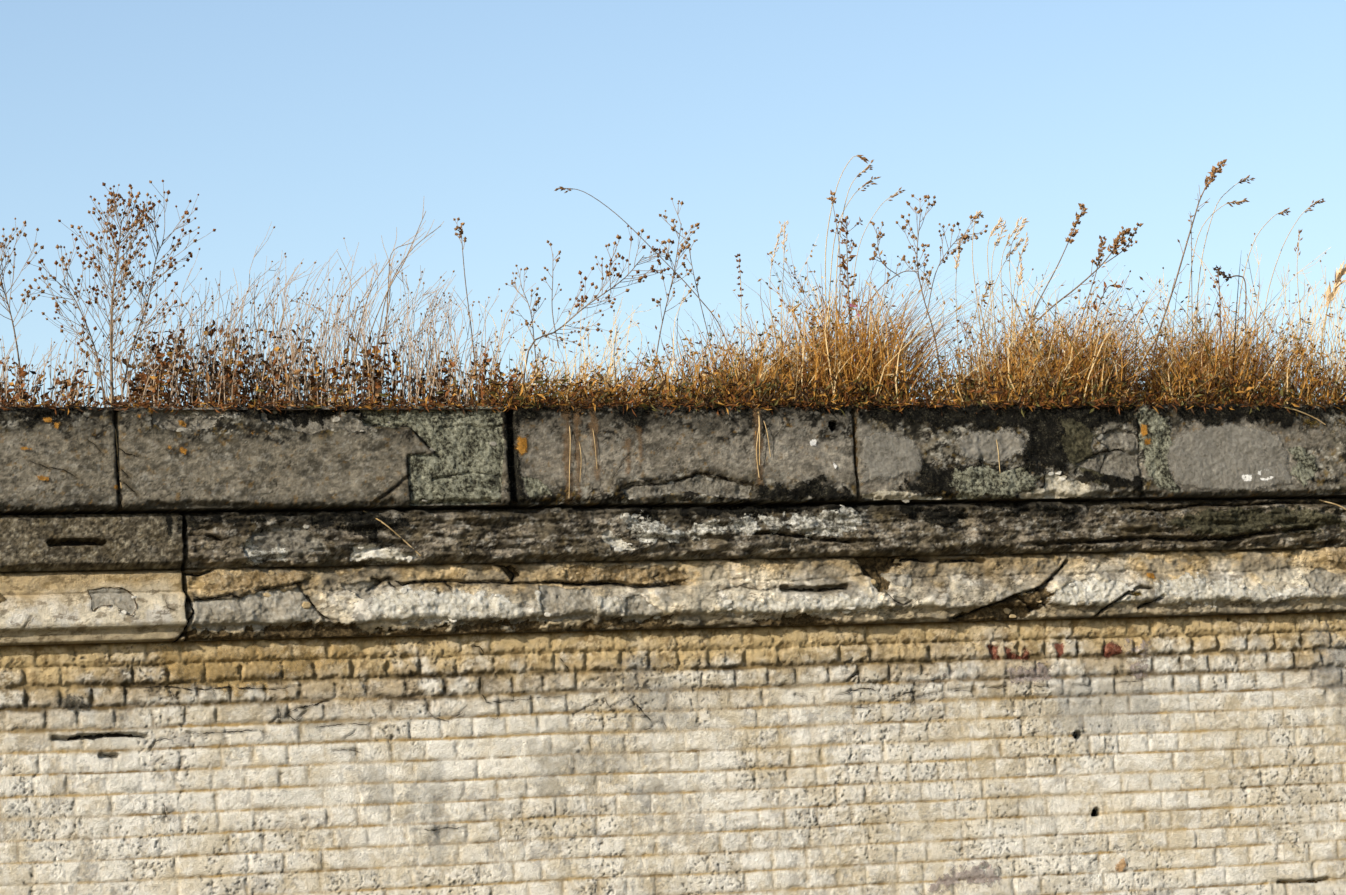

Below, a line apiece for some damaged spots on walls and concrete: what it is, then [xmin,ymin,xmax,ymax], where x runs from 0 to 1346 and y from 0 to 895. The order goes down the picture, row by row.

peeling [88,587,137,616]
crack [161,518,329,645]
spalling [243,523,327,561]
crack [951,501,1346,619]
crack [53,686,372,757]